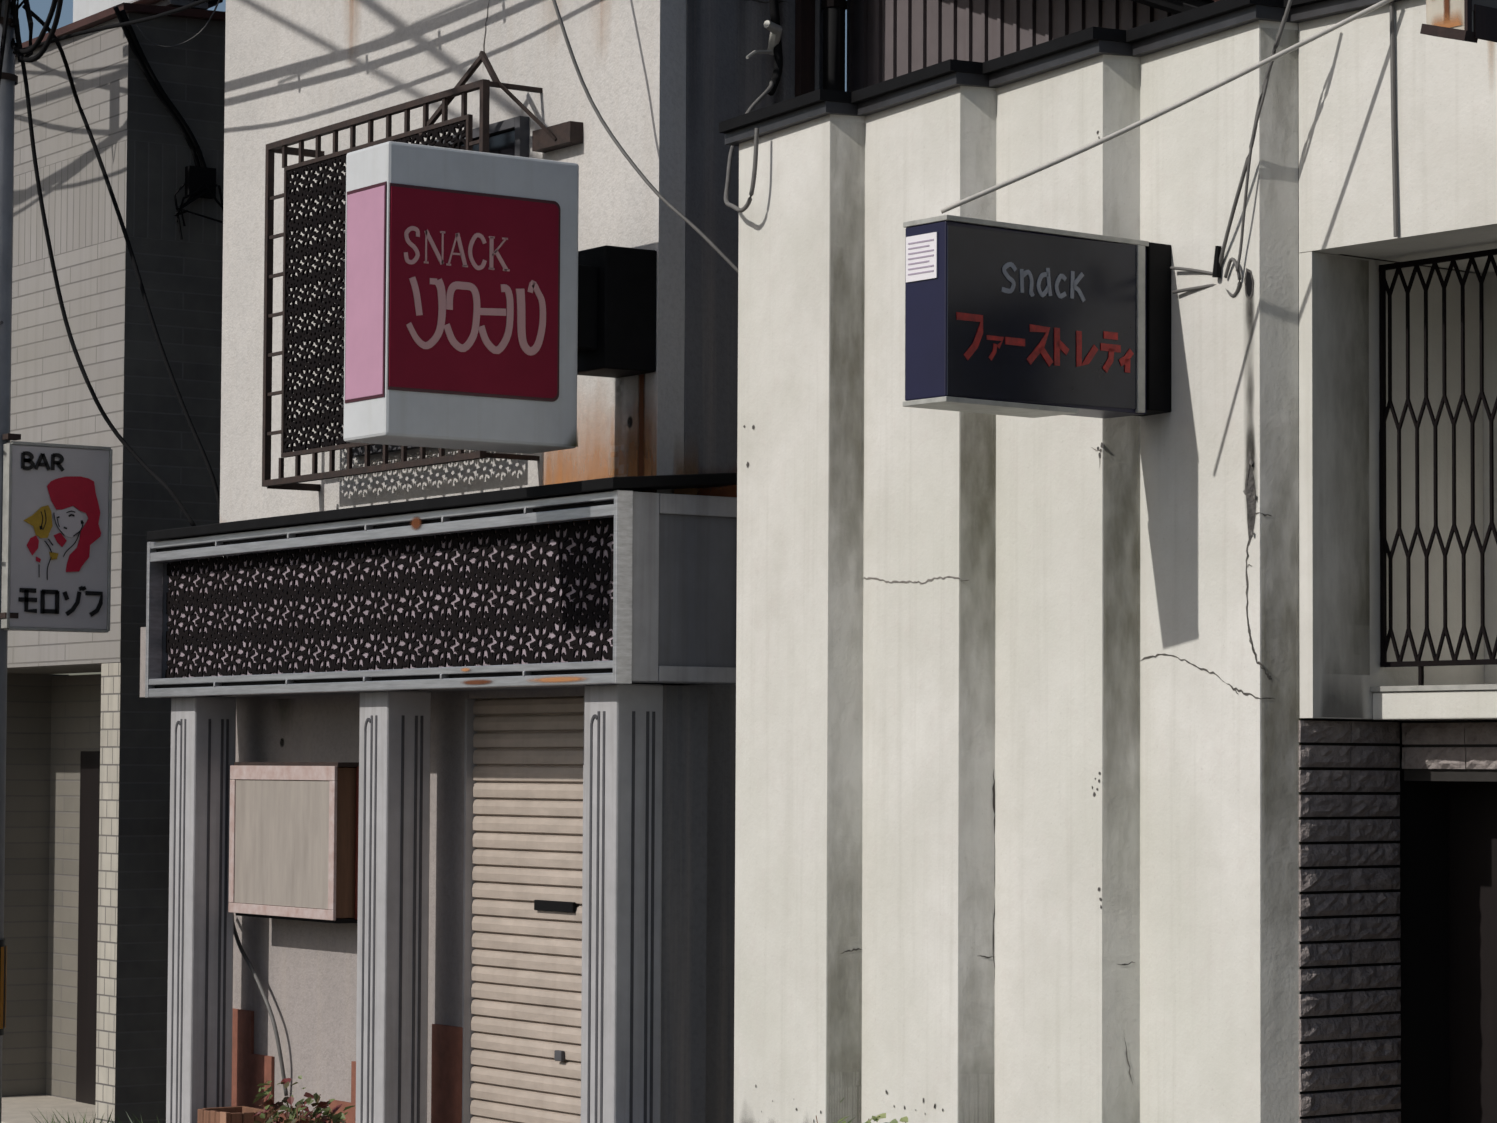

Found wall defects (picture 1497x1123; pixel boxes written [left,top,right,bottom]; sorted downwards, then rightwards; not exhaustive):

rust [1433,0,1462,28]
rust [544,374,657,493]
rust [674,471,737,497]
crack [864,576,968,584]
crack [1140,512,1274,699]